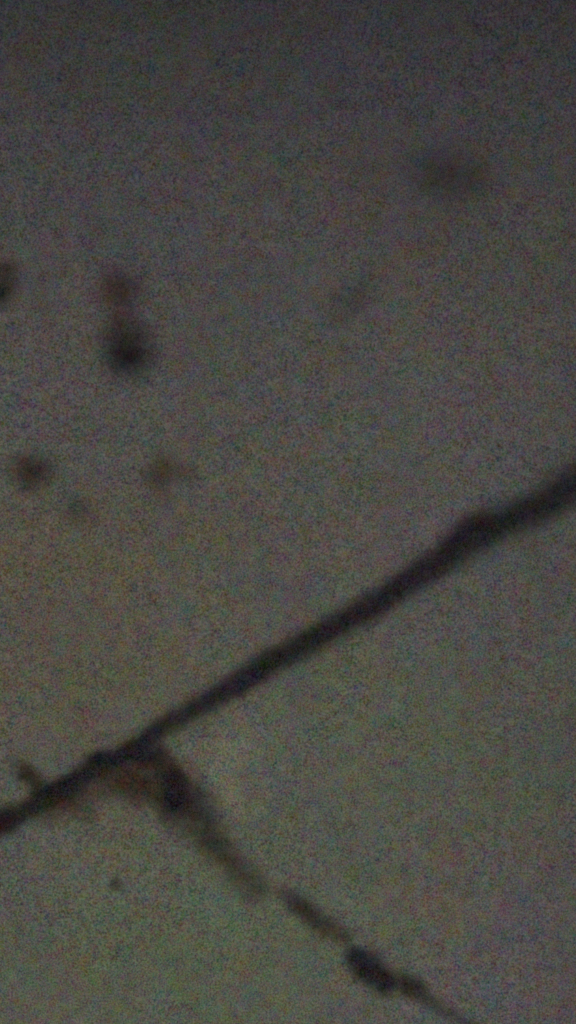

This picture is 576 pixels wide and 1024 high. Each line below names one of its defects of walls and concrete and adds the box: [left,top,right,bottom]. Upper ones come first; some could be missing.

crack [0,472,576,860]
crack [295,901,322,925]
crack [348,949,421,994]